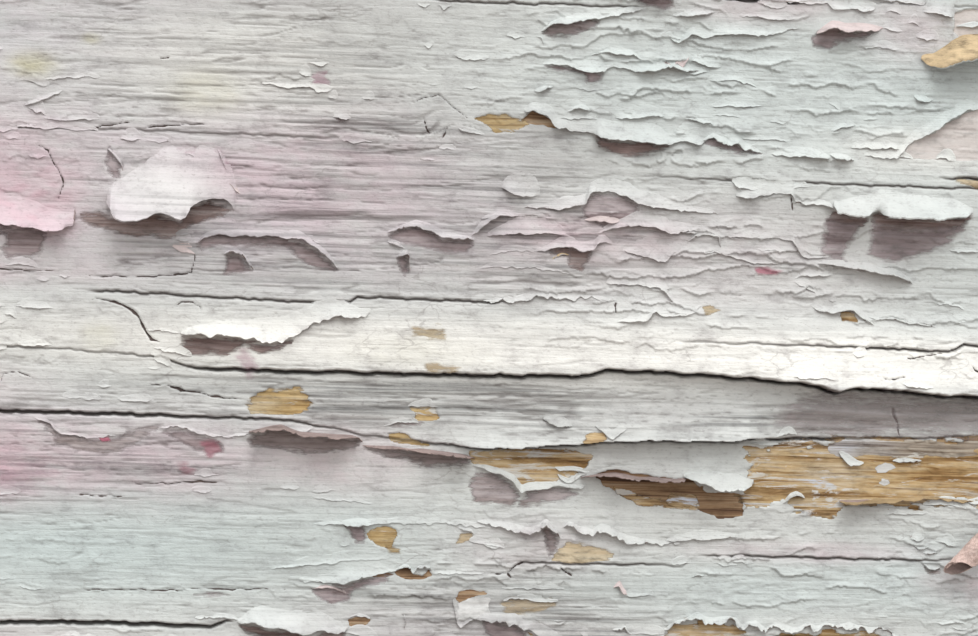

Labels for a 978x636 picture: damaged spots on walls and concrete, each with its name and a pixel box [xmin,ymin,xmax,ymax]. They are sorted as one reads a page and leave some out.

peeling [262,58,351,120]
peeling [507,0,978,161]
peeling [0,128,338,281]
peeling [387,172,978,293]
peeling [146,298,371,369]
peeling [812,296,936,328]
peeling [748,367,978,446]
peeling [839,451,864,466]
peeling [875,458,921,486]
peeling [195,516,739,636]
peeling [911,527,978,575]
peeling [613,609,897,636]